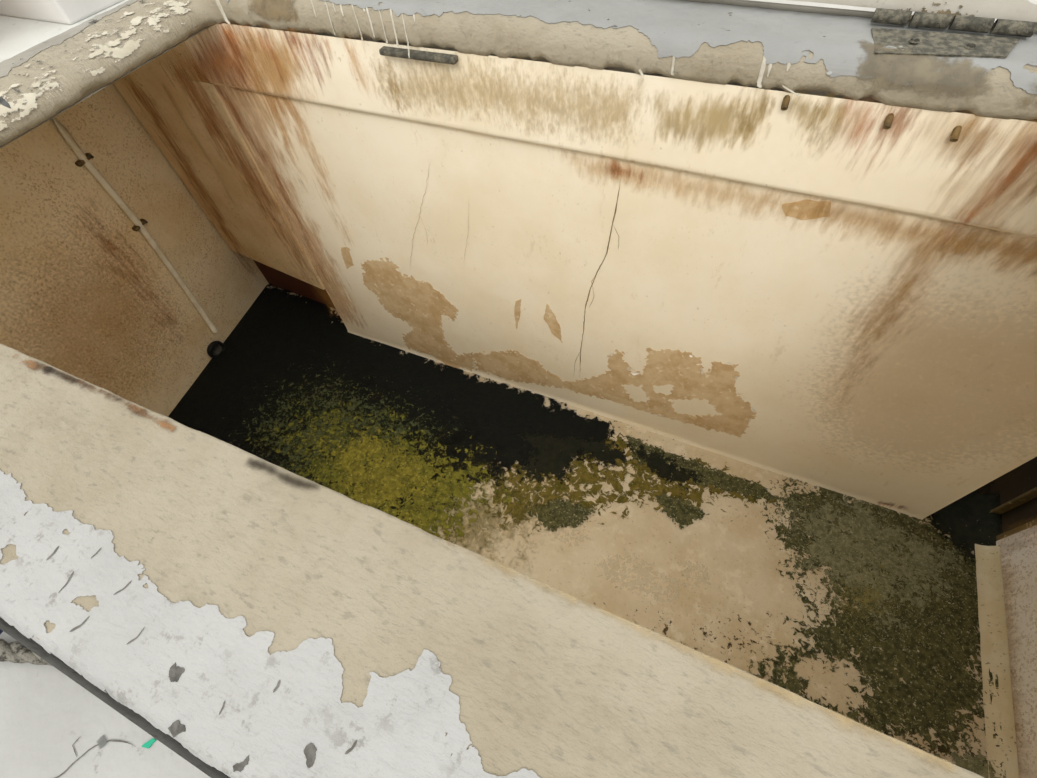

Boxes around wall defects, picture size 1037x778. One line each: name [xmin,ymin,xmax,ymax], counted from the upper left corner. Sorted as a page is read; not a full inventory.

peeling [0,0,191,131]
rust [175,30,276,222]
mould [168,284,704,522]
peeling [341,247,757,437]
crack [574,175,622,369]
peeling [320,0,1037,95]
peeling [782,199,831,220]
peeling [0,470,540,778]
mould [680,607,778,663]